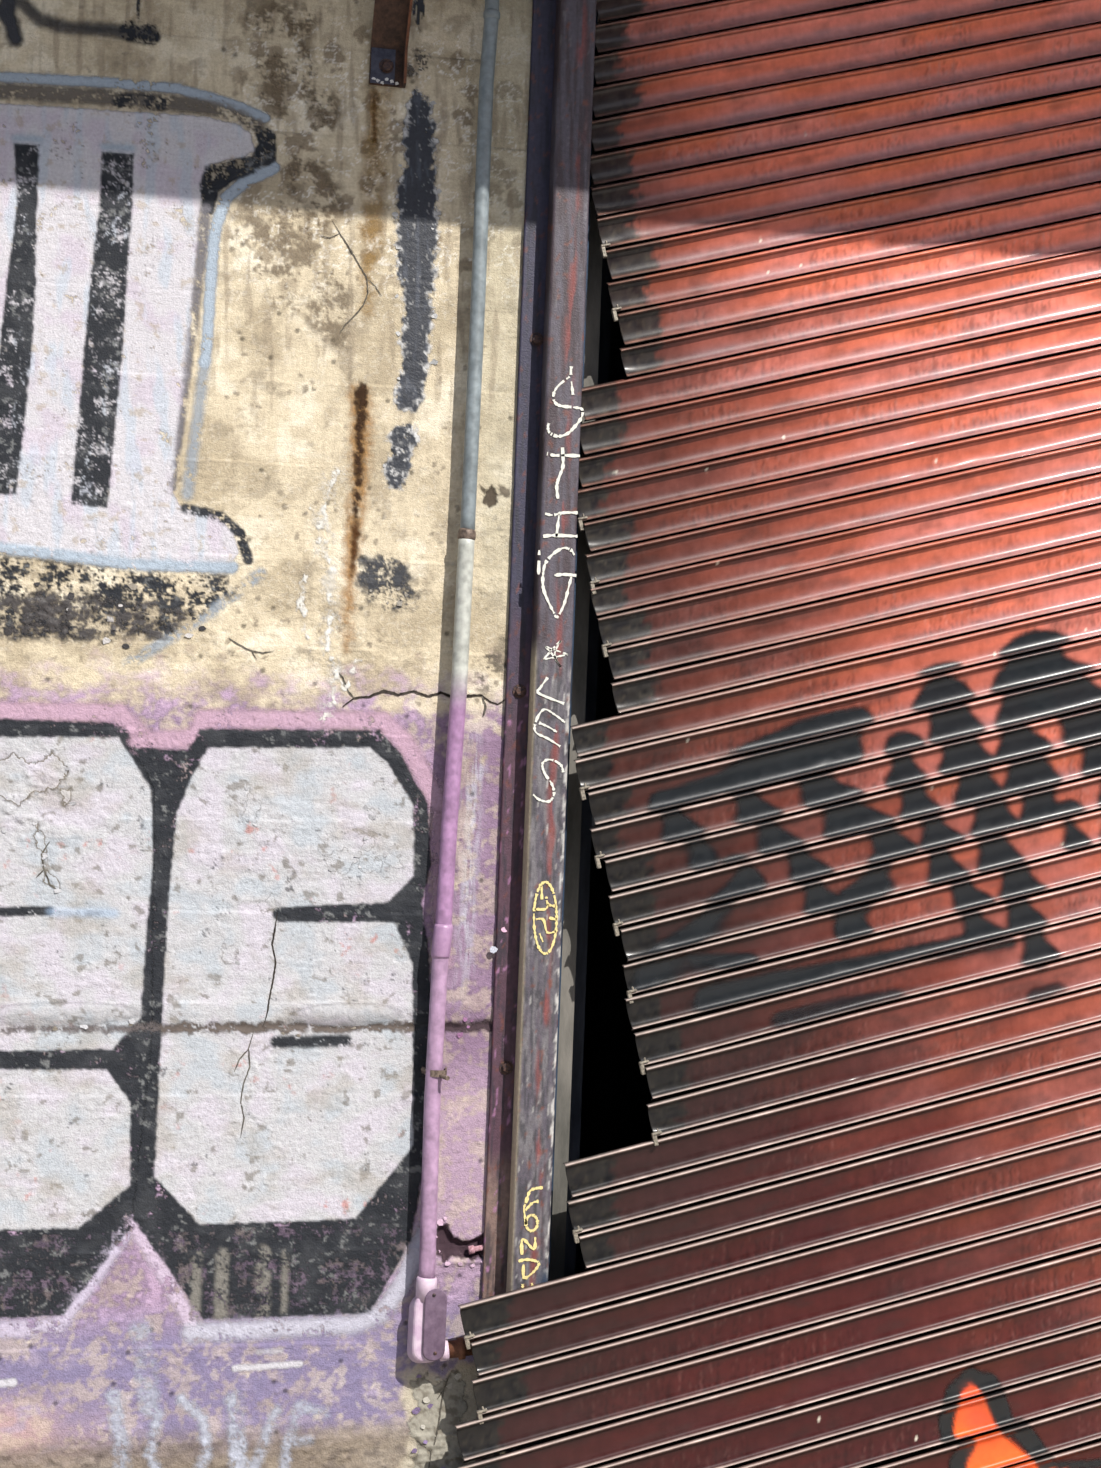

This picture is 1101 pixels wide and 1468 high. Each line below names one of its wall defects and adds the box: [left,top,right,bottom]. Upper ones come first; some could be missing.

rust [345,383,370,610]
crack [339,673,505,716]